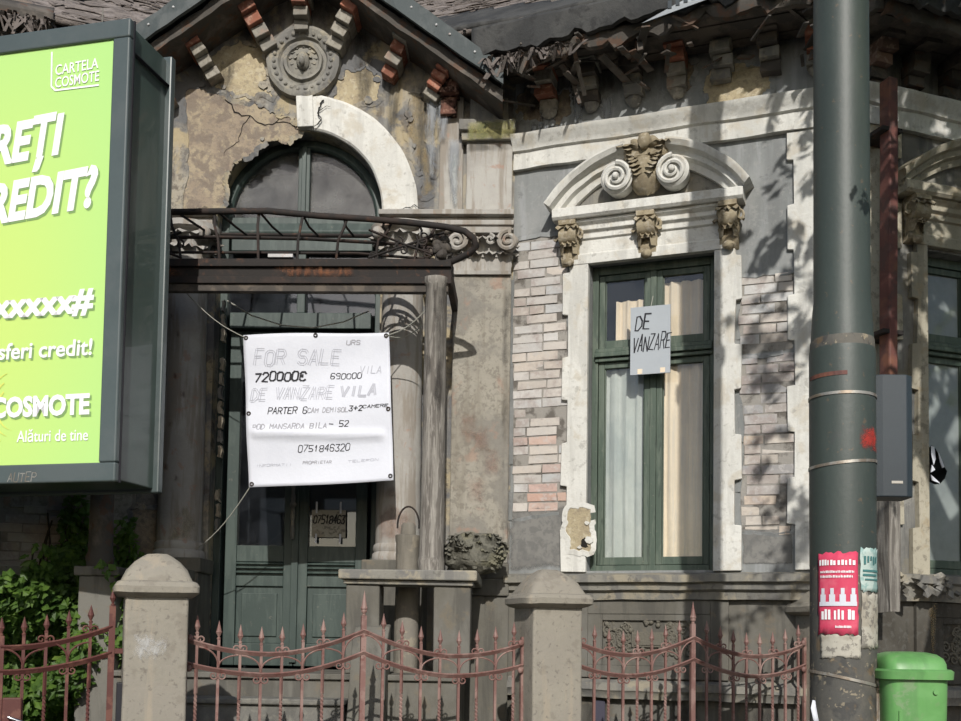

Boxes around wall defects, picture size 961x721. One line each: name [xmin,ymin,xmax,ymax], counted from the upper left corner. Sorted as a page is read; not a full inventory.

crack [225,99,330,151]
spalling [698,56,776,105]
flaking render [508,231,597,557]
flaking render [735,270,795,537]